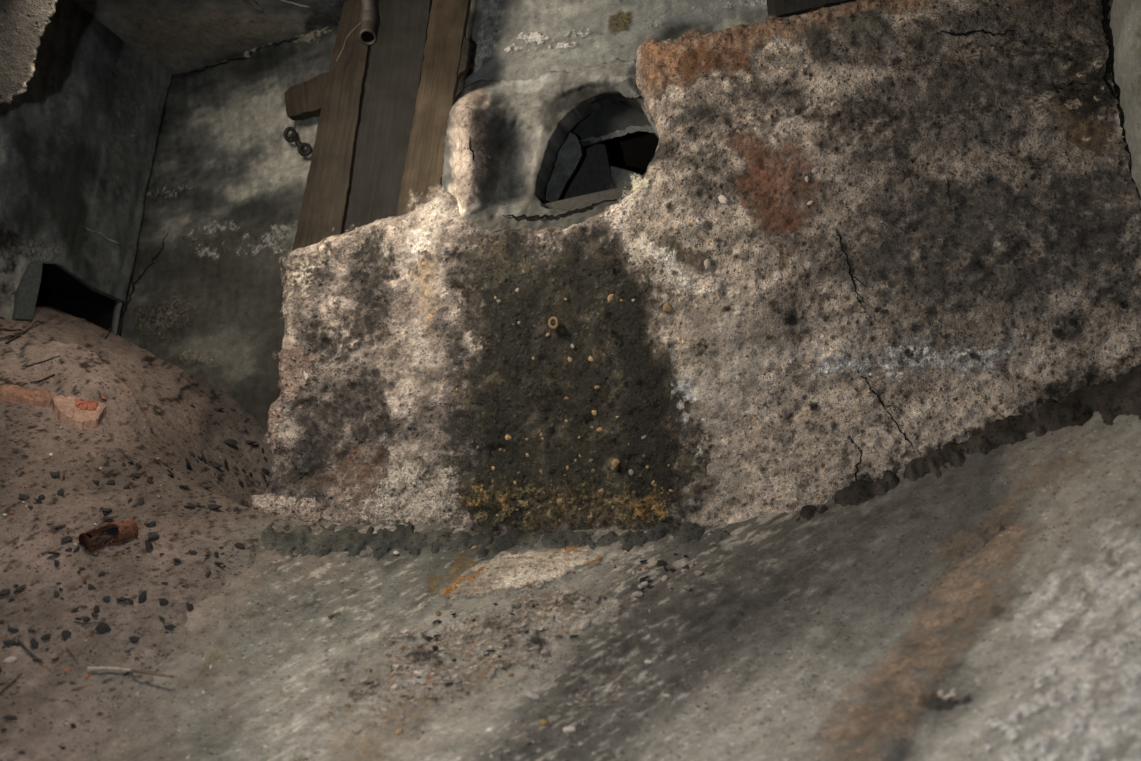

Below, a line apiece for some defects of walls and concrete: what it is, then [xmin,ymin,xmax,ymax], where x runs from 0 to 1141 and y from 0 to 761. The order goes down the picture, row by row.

crack [1048,0,1141,212]
corrosion [725,132,821,267]
damp [188,220,366,315]
damp [252,173,1013,534]
crack [848,436,862,481]
crack [857,365,918,452]